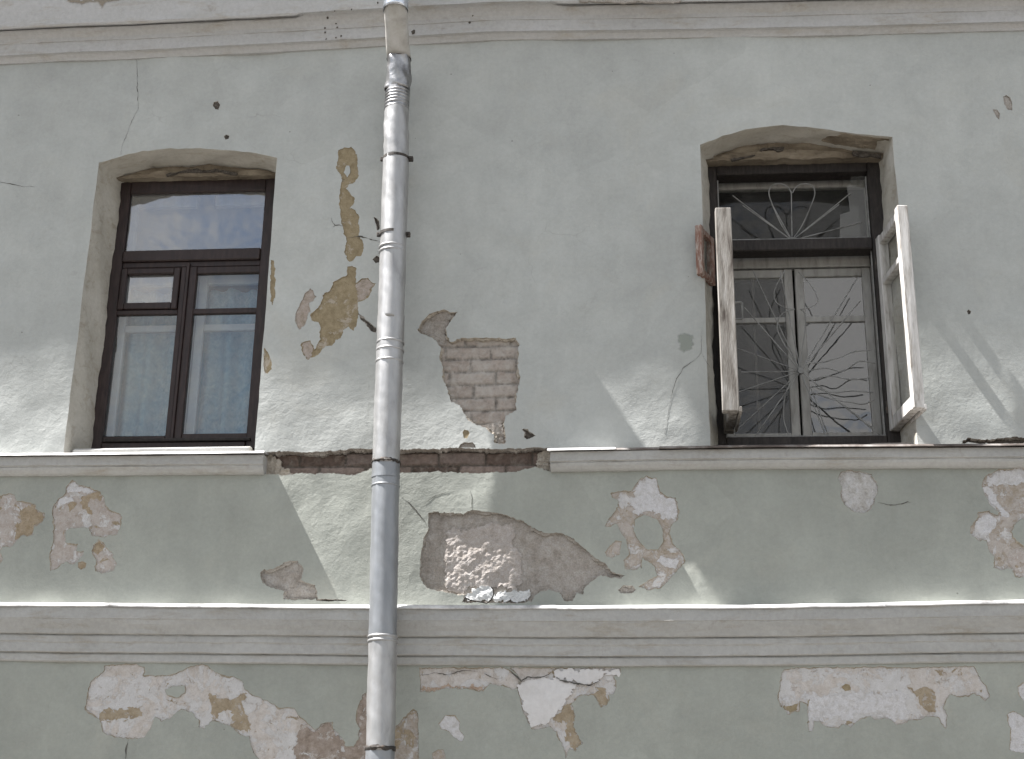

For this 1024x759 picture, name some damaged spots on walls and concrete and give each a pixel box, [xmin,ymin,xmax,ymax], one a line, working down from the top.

peeling [295,147,380,360]
flaking render [400,309,551,471]
peeling [0,480,122,574]
flaking render [260,561,347,601]
spalling [265,448,373,458]
flaking render [419,476,686,604]
flaking render [838,470,878,513]
peeling [970,468,1024,578]
peeling [85,663,367,759]
peeling [438,715,464,742]
peeling [419,667,520,693]
peeling [777,666,990,732]